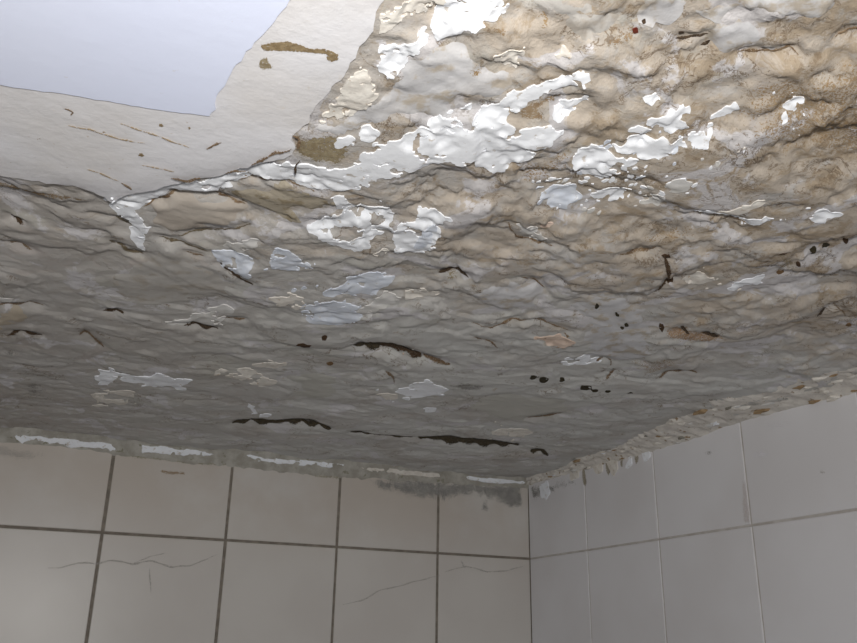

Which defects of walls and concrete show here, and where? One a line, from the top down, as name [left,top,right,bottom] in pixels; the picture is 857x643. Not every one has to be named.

peeling [0,0,591,257]
peeling [643,92,660,106]
peeling [781,92,805,136]
peeling [532,102,740,215]
peeling [694,200,786,226]
peeling [805,207,843,224]
peeling [211,238,260,285]
peeling [268,271,440,325]
peeling [90,367,193,407]
flaking render [15,435,115,451]
spalling [467,367,857,500]
crack [61,553,213,590]